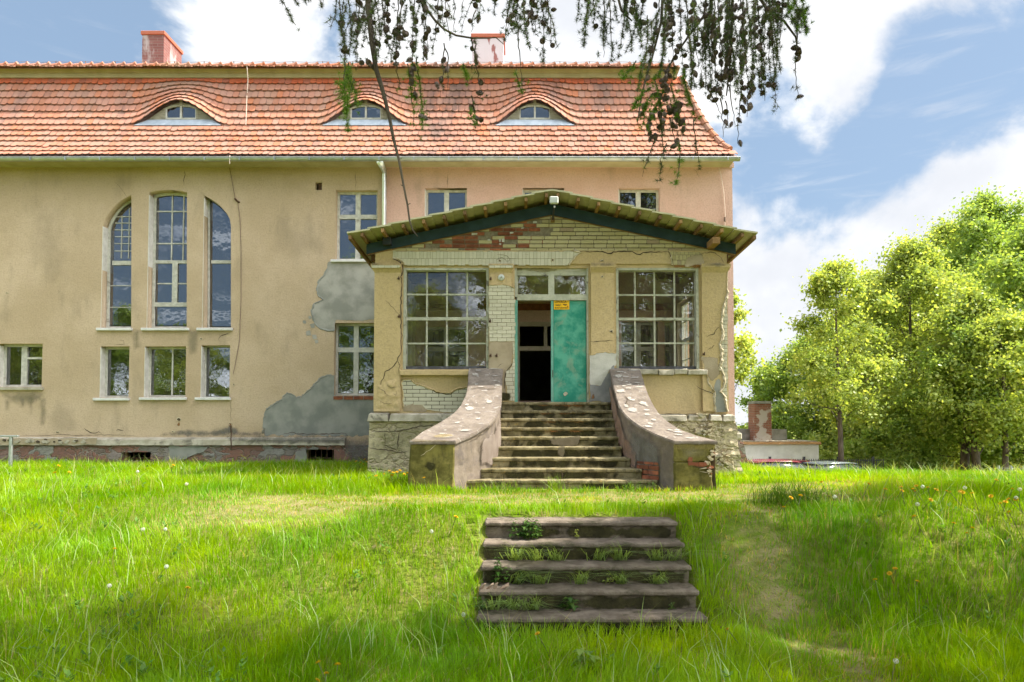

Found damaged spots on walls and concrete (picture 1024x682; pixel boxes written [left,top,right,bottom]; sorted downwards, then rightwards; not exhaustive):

flaking render [372,221,581,268]
flaking render [400,379,468,413]
crack [381,259,513,395]
peeling [589,351,659,480]
flaking render [695,271,729,436]